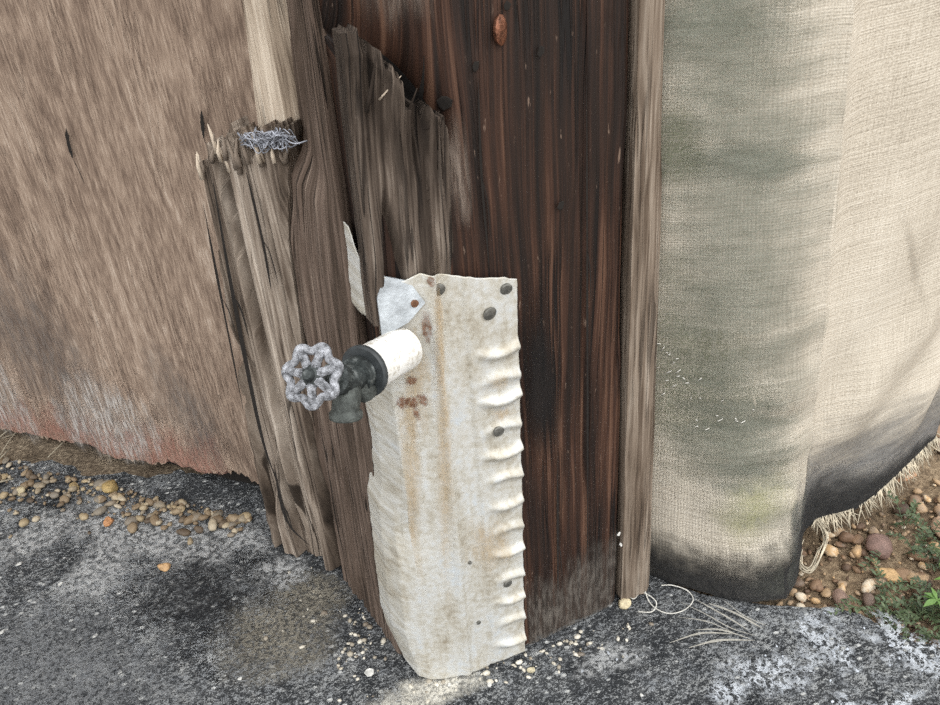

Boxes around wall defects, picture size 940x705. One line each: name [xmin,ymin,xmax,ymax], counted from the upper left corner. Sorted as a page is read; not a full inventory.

corrosion [397,396,427,420]